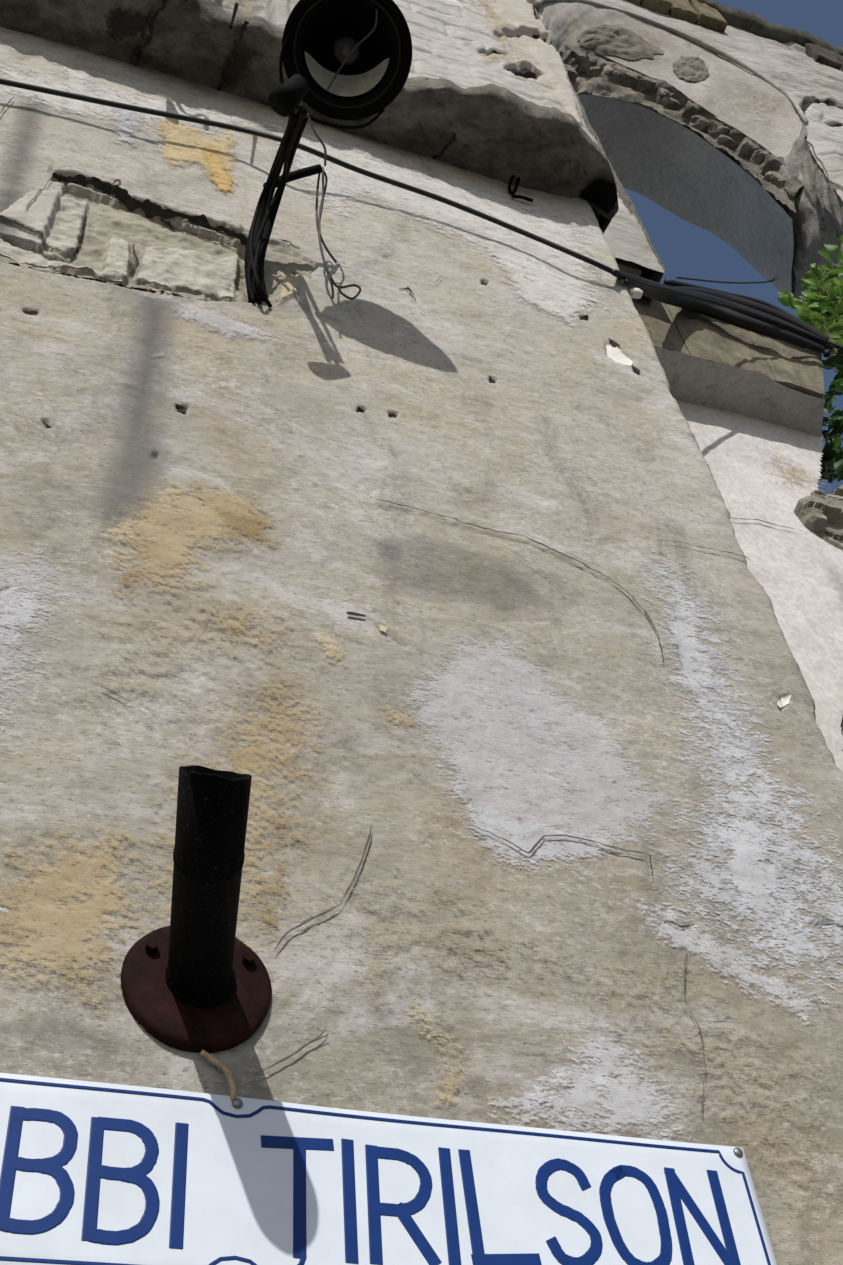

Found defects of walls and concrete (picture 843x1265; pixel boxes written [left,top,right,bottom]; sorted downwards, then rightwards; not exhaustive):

peeling [0,63,287,151]
spalling [0,190,294,341]
spalling [264,243,315,304]
peeling [290,128,606,326]
crack [376,499,663,658]
rust [129,655,339,979]